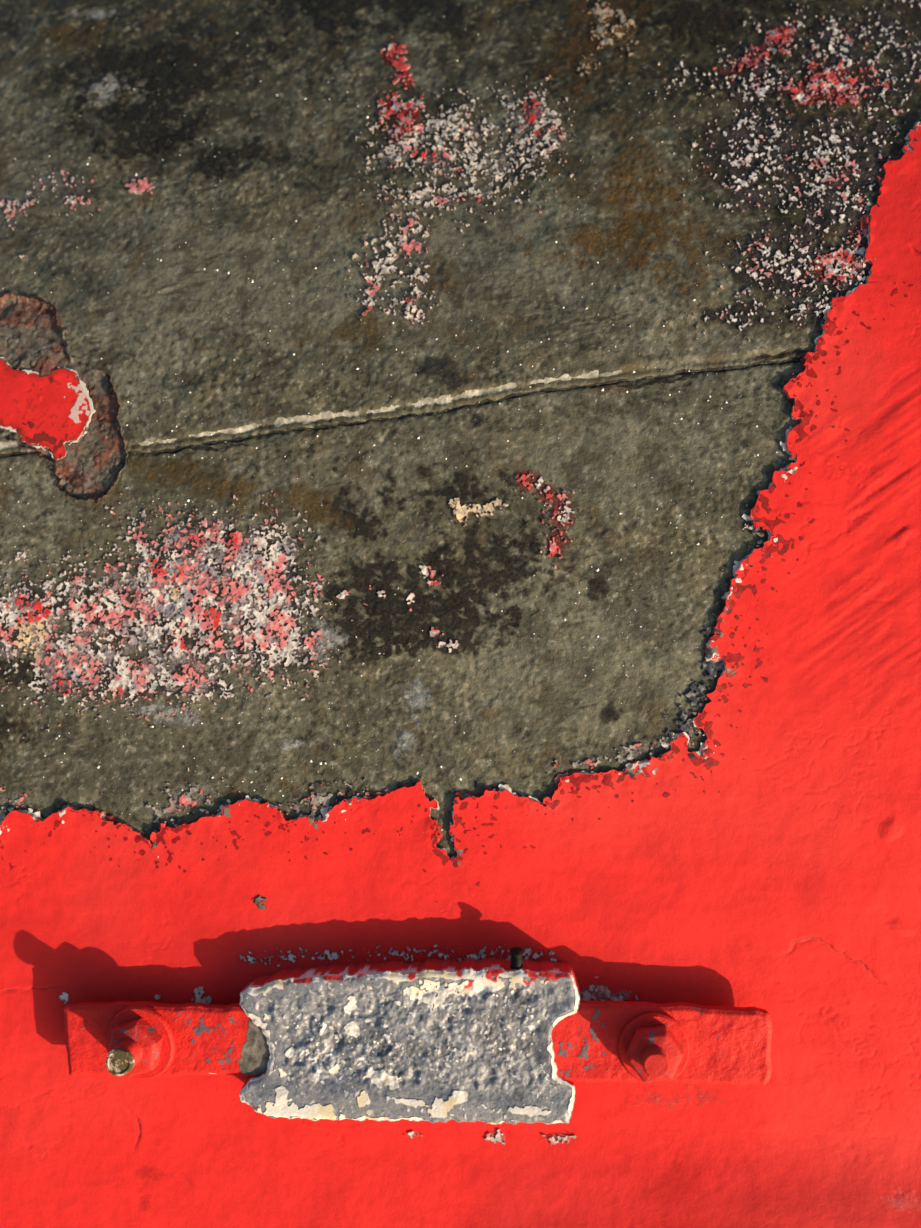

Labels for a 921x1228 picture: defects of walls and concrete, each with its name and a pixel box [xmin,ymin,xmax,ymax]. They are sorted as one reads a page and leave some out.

crack [0,441,33,458]
peeling [0,0,921,880]
crack [128,349,811,455]
peeling [238,944,639,1146]